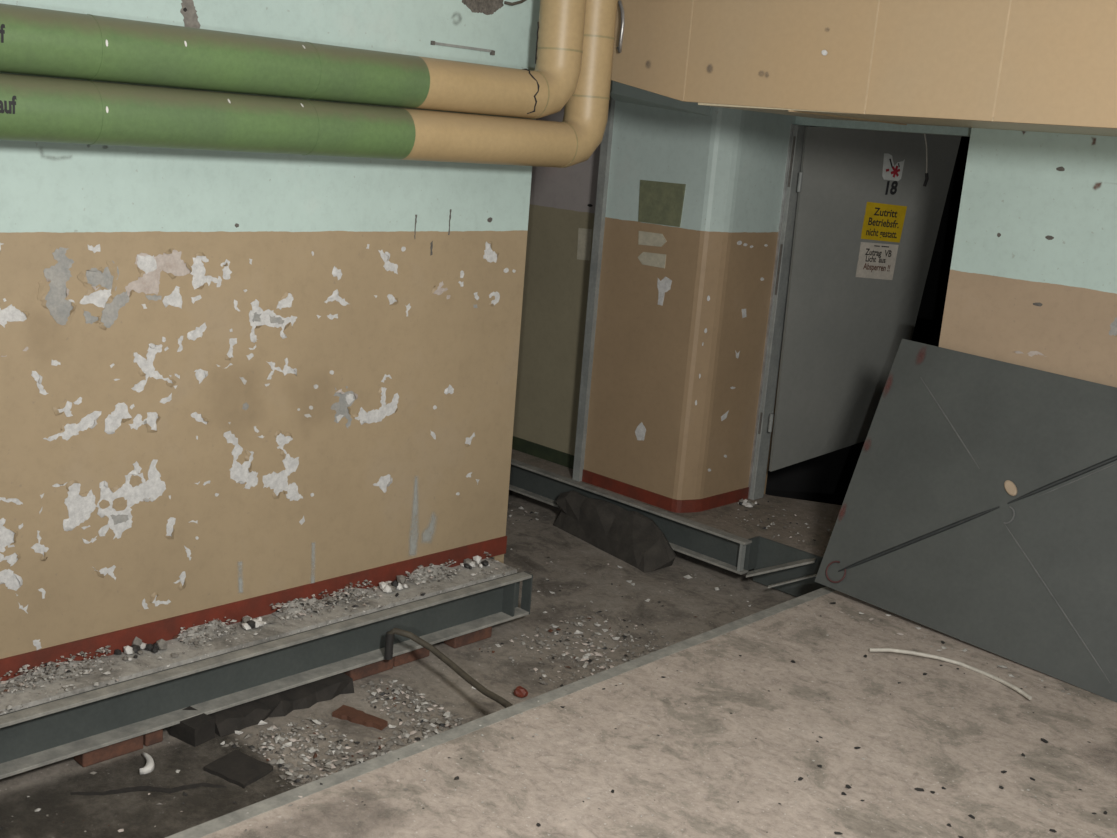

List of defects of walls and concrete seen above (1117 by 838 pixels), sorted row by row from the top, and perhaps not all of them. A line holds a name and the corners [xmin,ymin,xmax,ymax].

flaking render [462,0,504,15]
peeling [0,298,30,328]
peeling [37,244,232,330]
peeling [194,289,297,387]
peeling [317,266,349,320]
peeling [366,244,406,274]
peeling [43,323,209,441]
peeling [330,370,399,428]
peeling [223,422,314,501]
peeling [39,459,171,544]
peeling [0,518,49,613]
peeling [164,517,199,590]